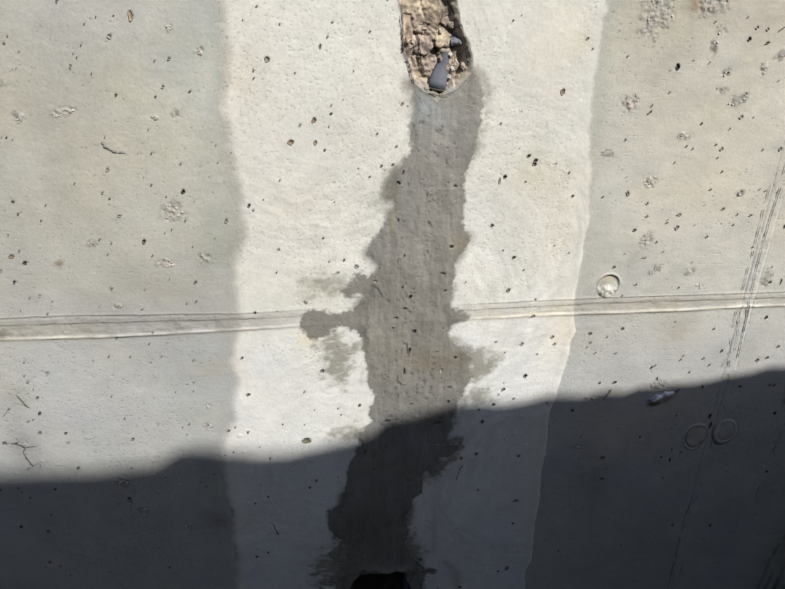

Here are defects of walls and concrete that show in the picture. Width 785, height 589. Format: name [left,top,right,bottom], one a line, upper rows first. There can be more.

spalling [398,0,473,98]
leakage [300,69,498,589]
crack [710,170,785,447]